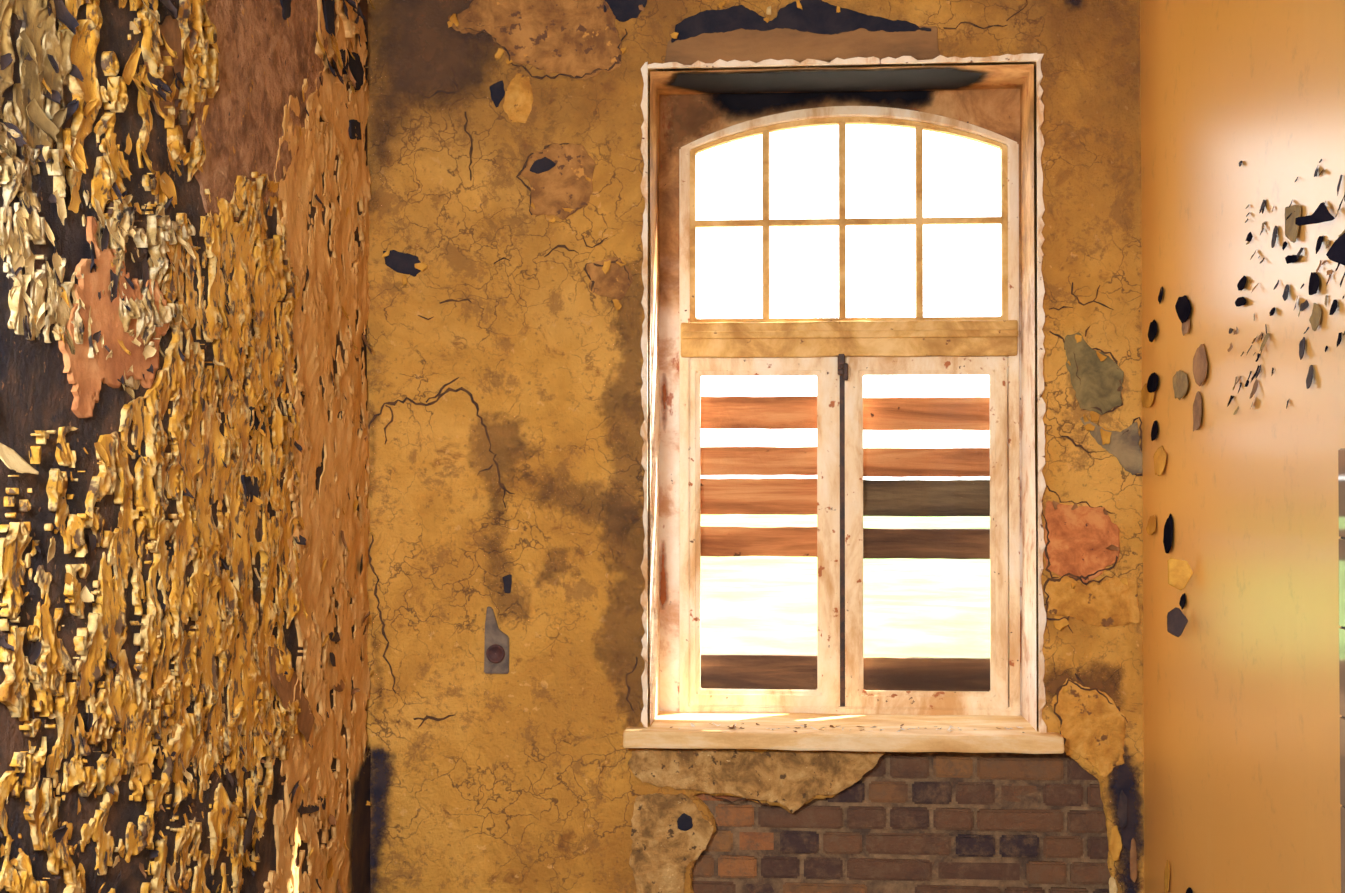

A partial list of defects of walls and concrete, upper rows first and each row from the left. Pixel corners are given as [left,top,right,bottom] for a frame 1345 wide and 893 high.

peeling [447,0,628,80]
peeling [1148,319,1157,342]
peeling [1158,287,1191,336]
peeling [1227,175,1345,415]
peeling [0,0,390,893]
crack [368,377,514,508]
peeling [1064,332,1208,476]
flaking render [1042,500,1140,631]
peeling [1146,514,1193,637]
flaking render [628,679,1138,893]